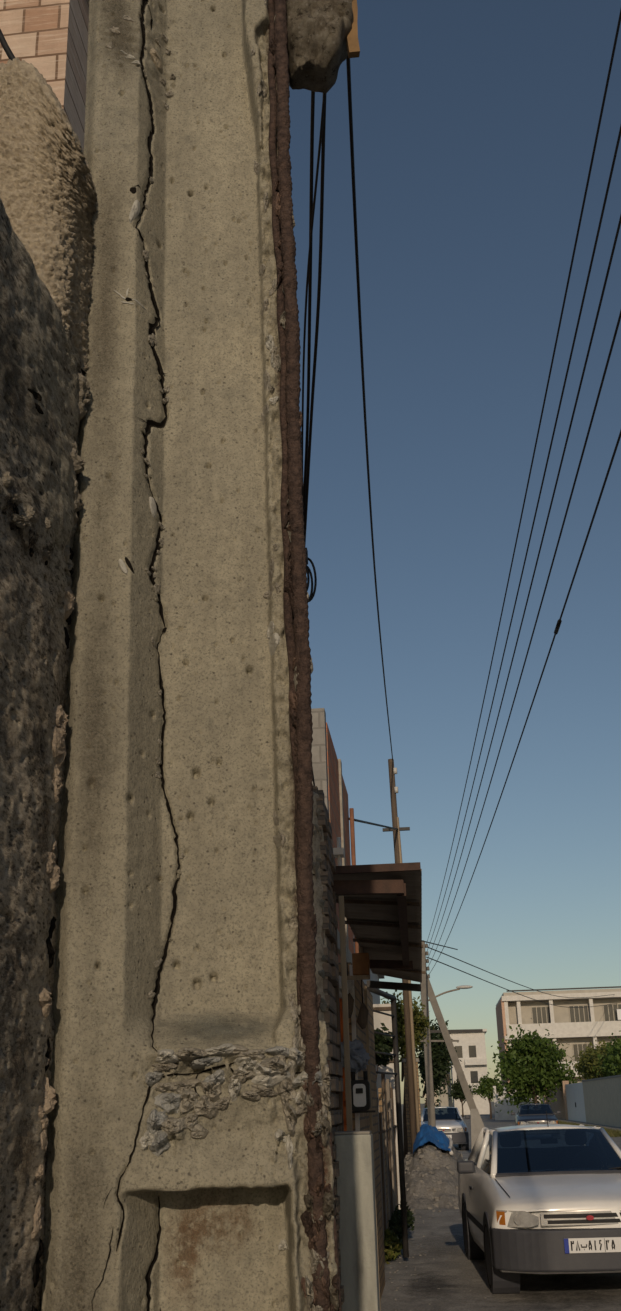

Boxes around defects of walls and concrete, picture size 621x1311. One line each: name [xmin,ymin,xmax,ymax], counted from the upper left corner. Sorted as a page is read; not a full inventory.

rust [271,180,295,293]
spalling [261,335,281,424]
rust [283,499,309,638]
crack [91,0,234,1311]
rust [288,654,314,856]
spalling [139,992,331,1170]
spalling [300,1174,339,1311]